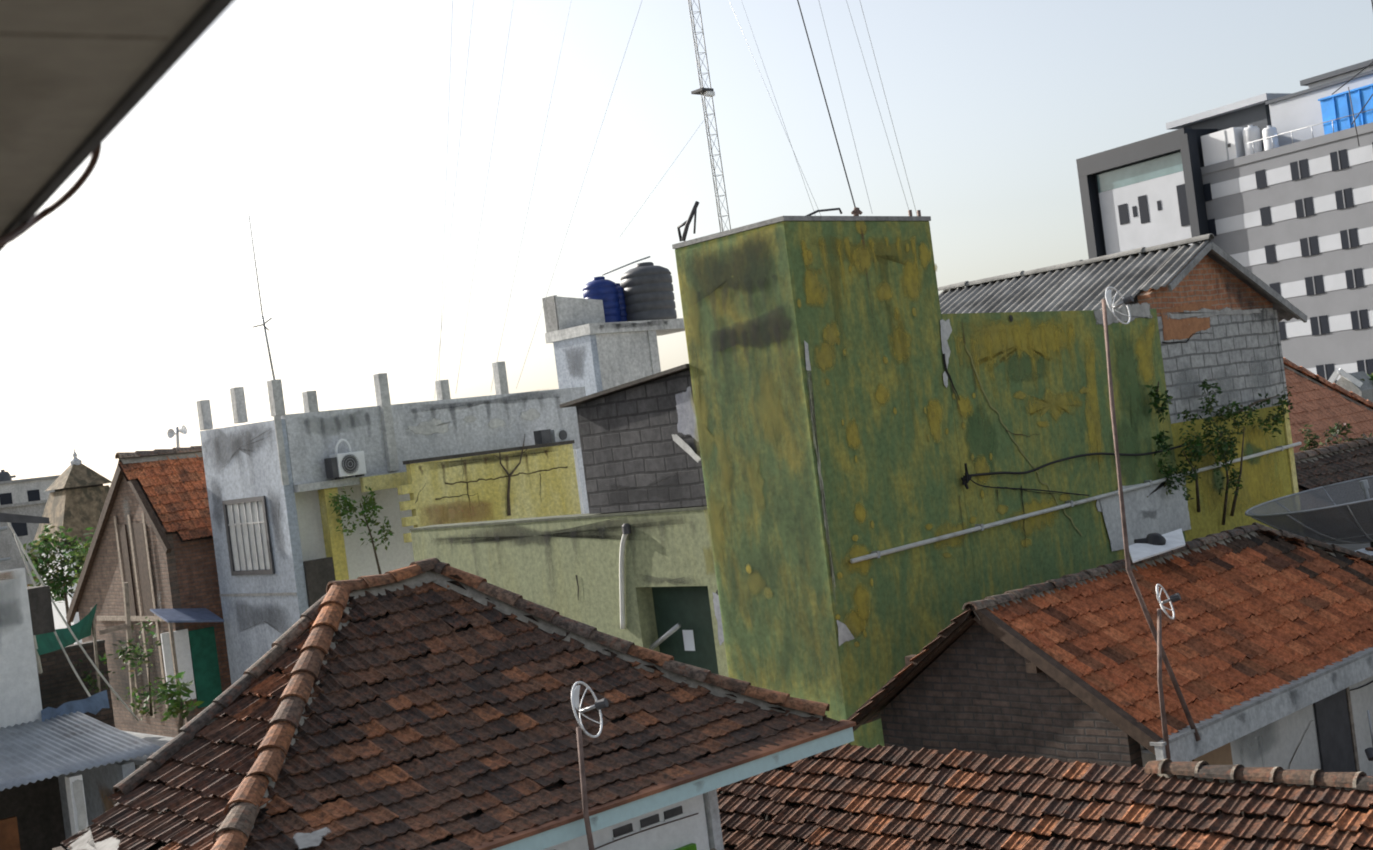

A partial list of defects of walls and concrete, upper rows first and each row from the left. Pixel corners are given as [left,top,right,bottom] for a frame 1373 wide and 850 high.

peeling [924,315,1073,547]
peeling [1014,300,1212,477]
peeling [926,517,976,558]
spalling [70,780,120,850]